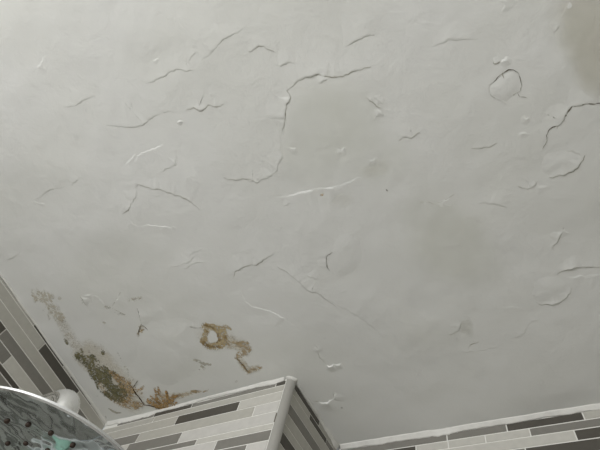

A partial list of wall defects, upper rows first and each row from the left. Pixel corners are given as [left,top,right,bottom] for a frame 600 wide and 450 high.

crack [540,80,600,147]
water stain [74,349,144,410]